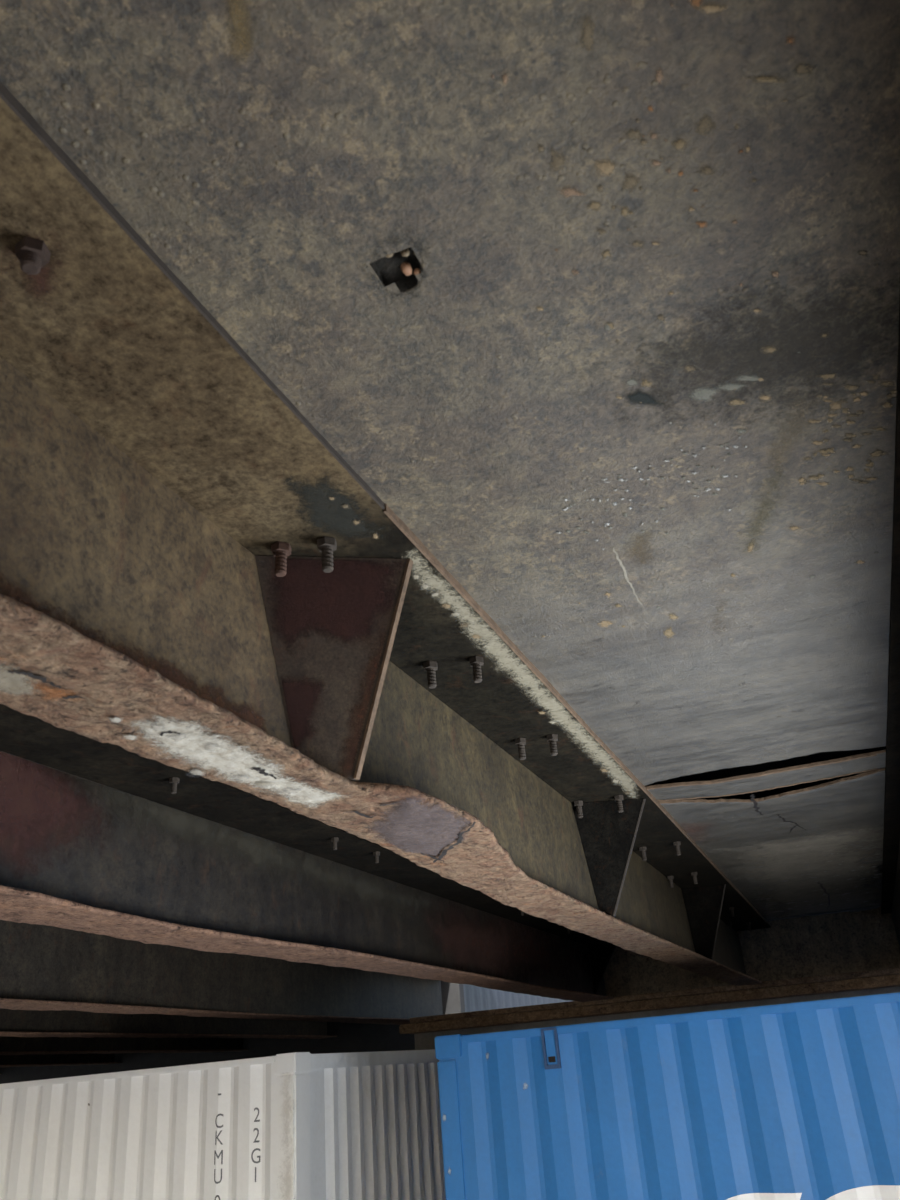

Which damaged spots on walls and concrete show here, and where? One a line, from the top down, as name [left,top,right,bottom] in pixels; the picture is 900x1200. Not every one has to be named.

spalling [358,230,430,301]
water stain [651,283,899,423]
rust [269,558,402,649]
rust [0,576,266,732]
rust [281,678,323,749]
crack [646,752,877,833]